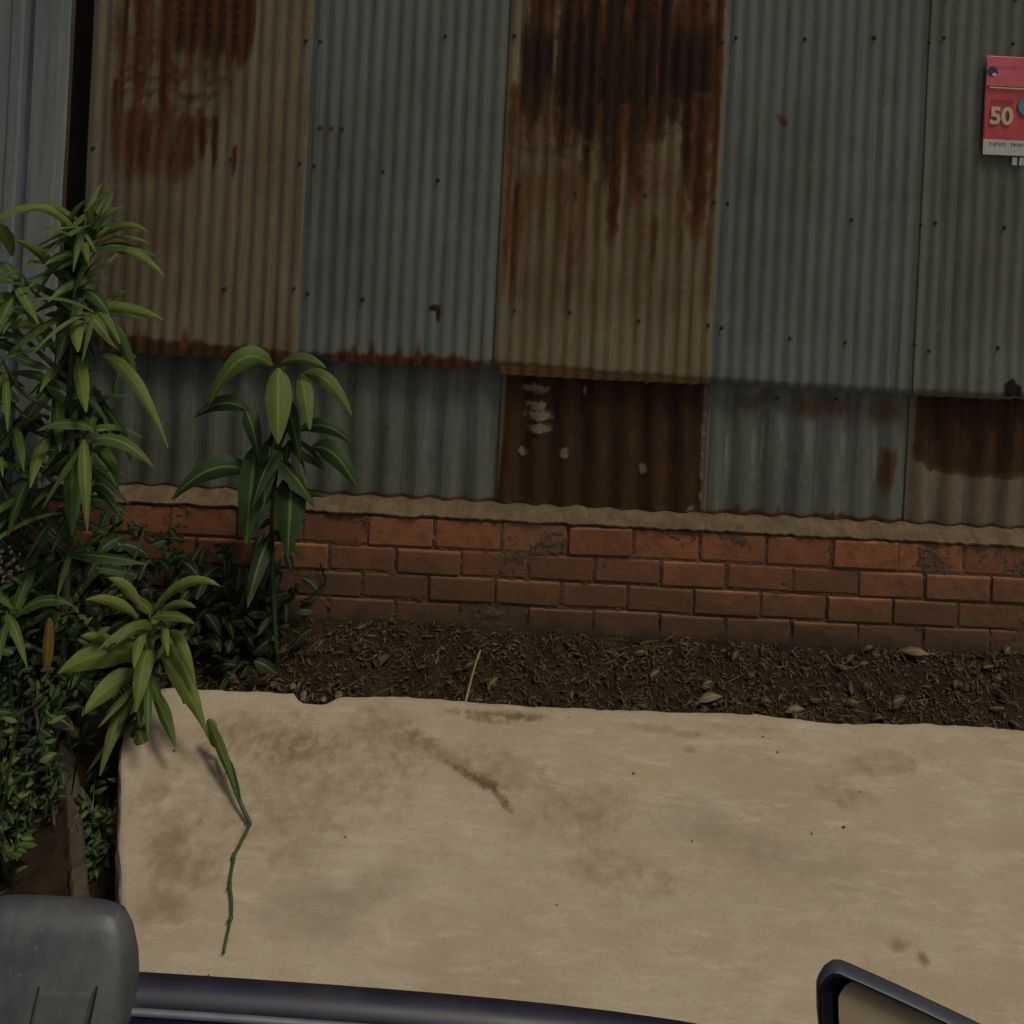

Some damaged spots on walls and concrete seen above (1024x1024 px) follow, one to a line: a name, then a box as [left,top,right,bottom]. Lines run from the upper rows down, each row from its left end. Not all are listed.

corrosion [110,0,257,180]
corrosion [503,0,726,303]
corrosion [100,327,244,357]
corrosion [326,343,482,369]
corrosion [327,374,704,513]
peeling [522,383,553,434]
corrosion [878,449,897,491]
corrosion [914,396,1024,479]